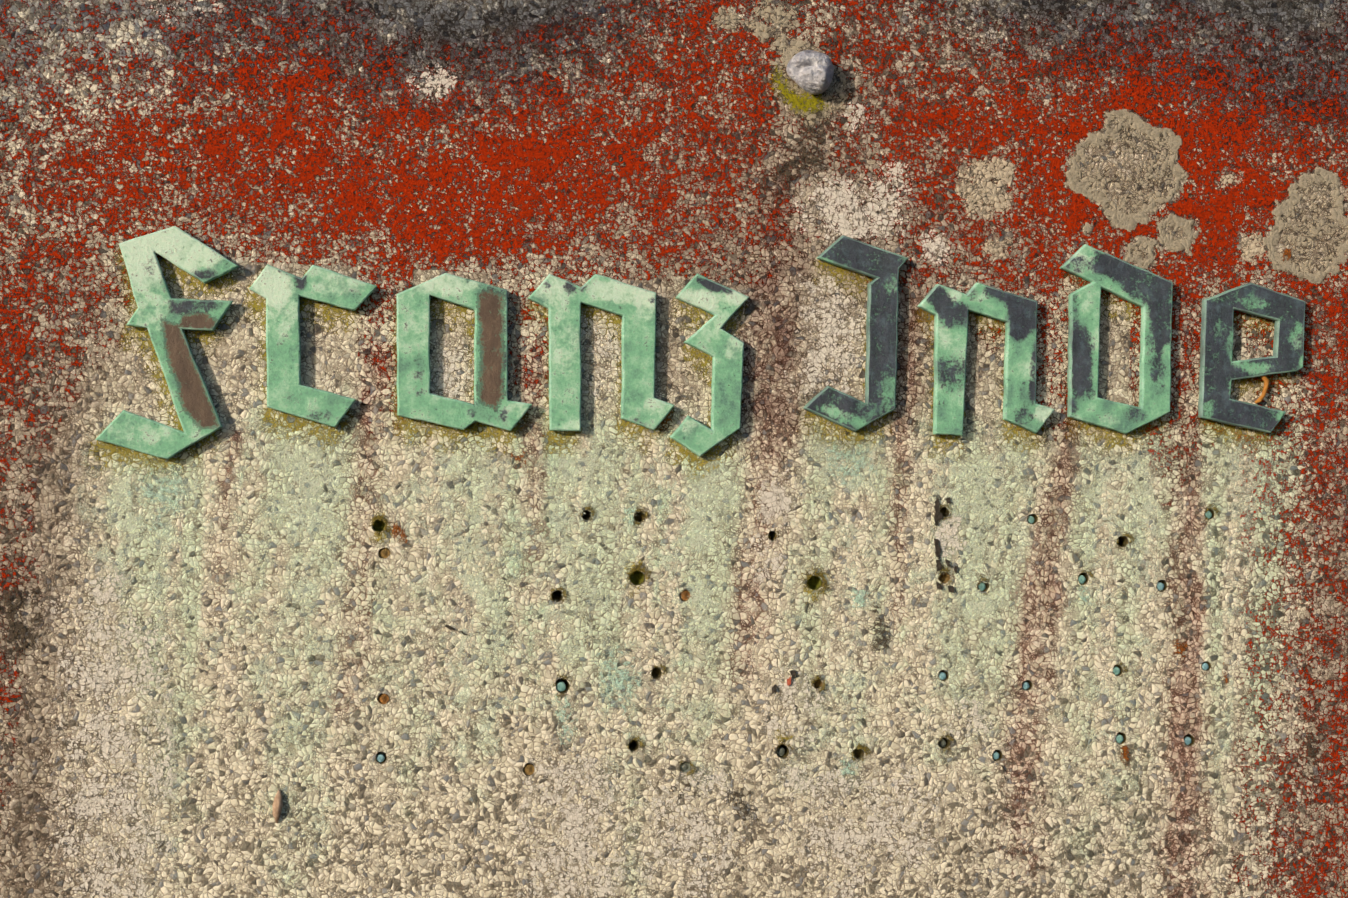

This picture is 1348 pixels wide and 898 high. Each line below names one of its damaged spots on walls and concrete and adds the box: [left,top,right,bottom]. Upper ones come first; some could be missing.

water stain [1100,290,1139,326]
water stain [1233,311,1275,338]
water stain [1230,371,1299,399]
water stain [763,260,941,898]
water stain [898,308,1170,760]
water stain [1200,416,1285,625]